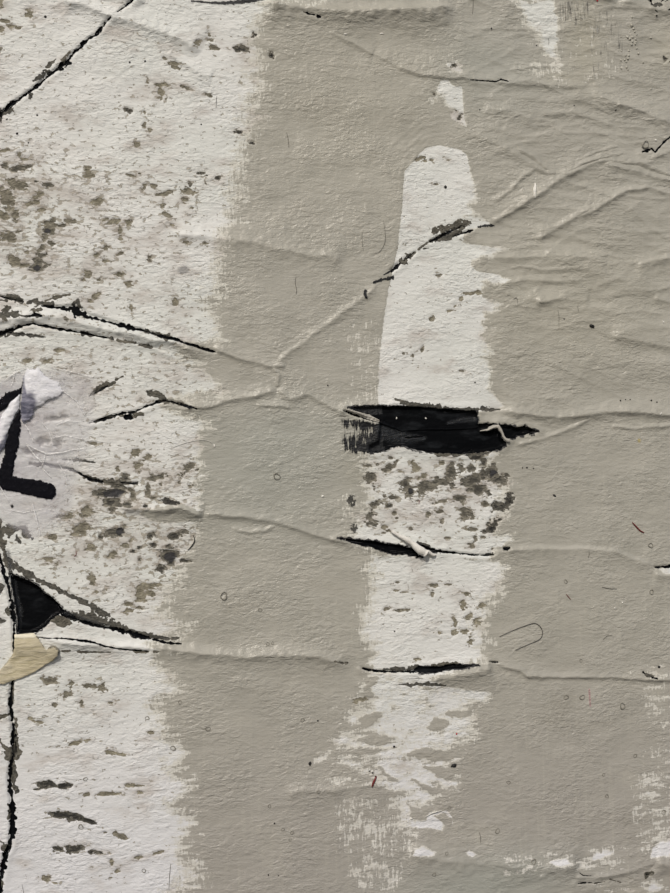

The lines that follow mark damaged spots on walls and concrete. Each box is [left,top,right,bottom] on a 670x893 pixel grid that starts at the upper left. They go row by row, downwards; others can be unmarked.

crack [0,0,134,123]
crack [642,136,670,153]
crack [363,218,494,299]
crack [0,293,216,352]
peeling [21,437,65,456]
crack [0,680,23,893]